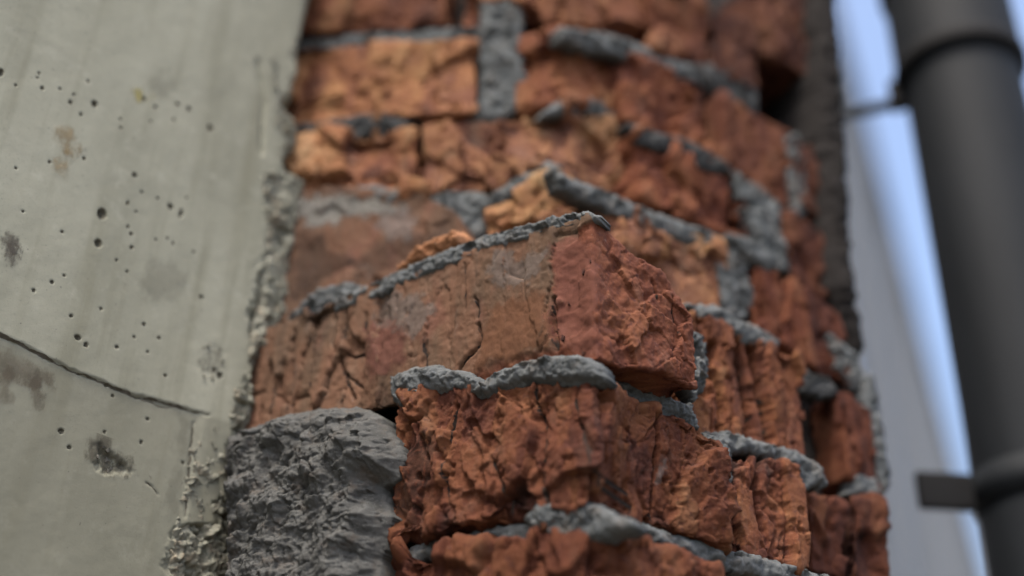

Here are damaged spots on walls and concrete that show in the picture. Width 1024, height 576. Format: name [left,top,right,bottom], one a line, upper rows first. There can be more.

crack [270,315,369,411]
crack [421,336,429,366]
crack [464,267,483,365]
crack [542,303,560,350]
crack [0,332,205,513]
spalling [89,435,133,474]